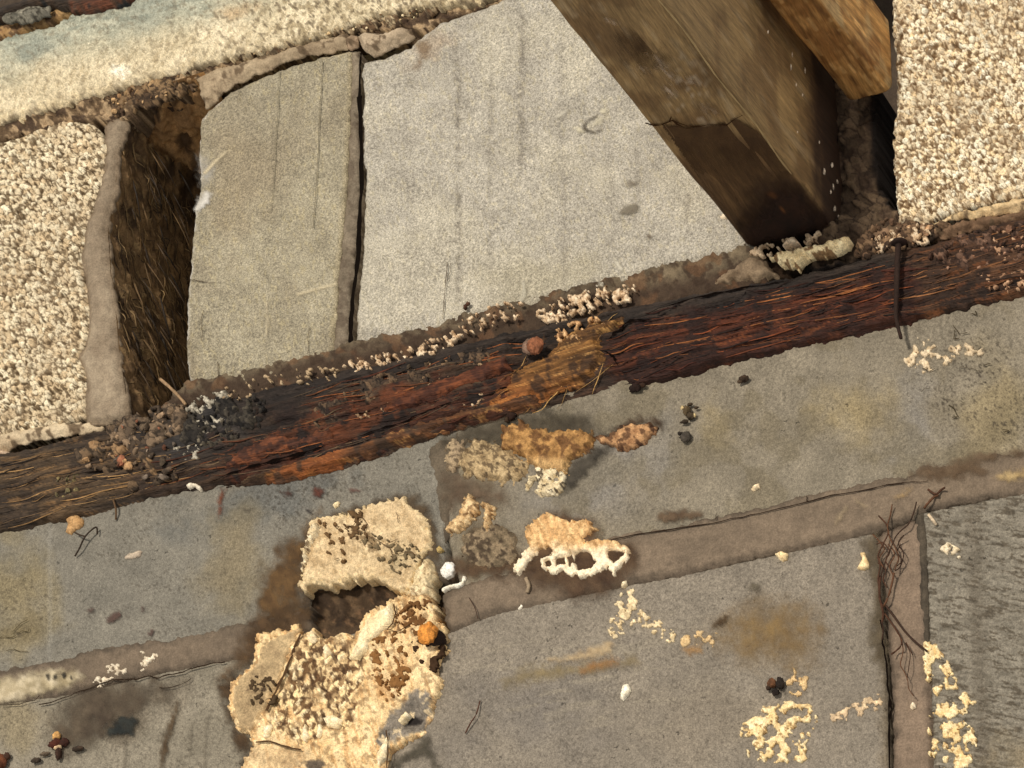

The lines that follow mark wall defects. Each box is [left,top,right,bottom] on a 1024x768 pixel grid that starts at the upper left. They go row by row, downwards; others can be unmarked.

water stain [217,525,310,766]
spalling [227,493,717,768]